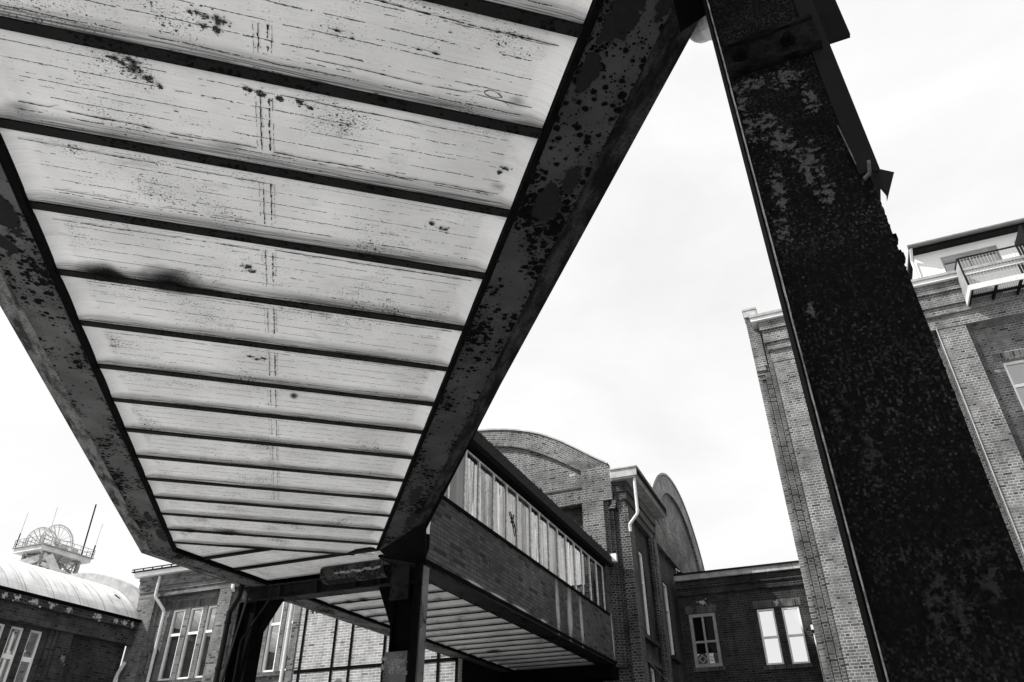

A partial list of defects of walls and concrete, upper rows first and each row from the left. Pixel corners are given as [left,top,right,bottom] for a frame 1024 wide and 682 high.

rust [575,0,674,96]
rust [0,195,26,259]
damp [94,270,127,281]
damp [162,282,214,294]